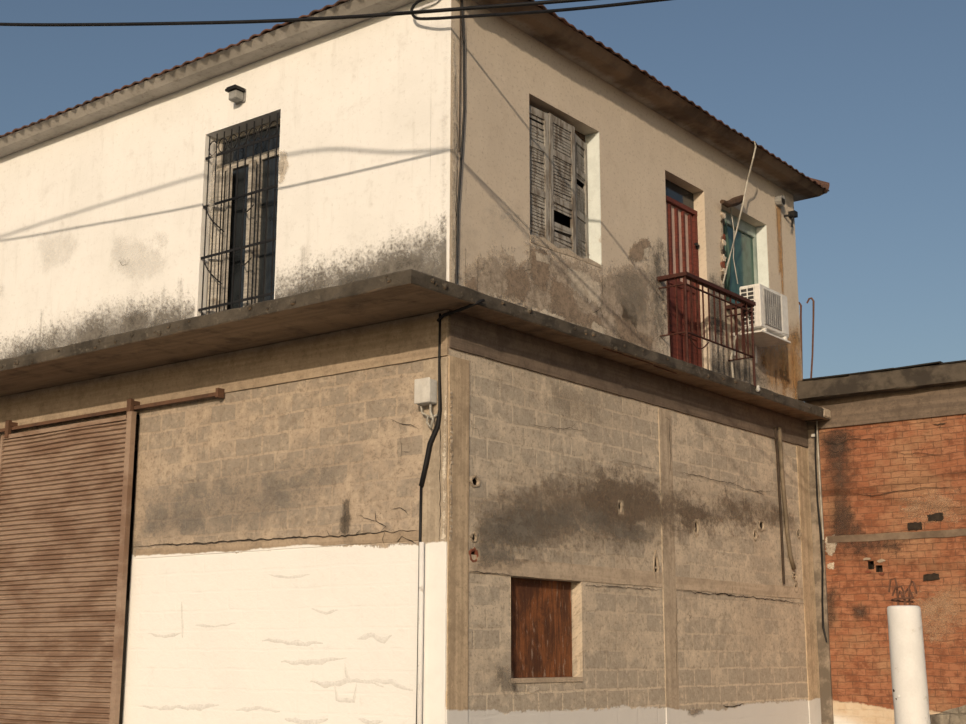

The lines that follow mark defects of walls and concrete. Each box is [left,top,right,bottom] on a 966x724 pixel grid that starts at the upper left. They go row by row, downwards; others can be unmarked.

flaking render [431,38,677,374]
leakage [275,217,446,299]
leakage [0,296,195,359]
corrosion [759,332,803,399]
leakage [480,478,661,567]